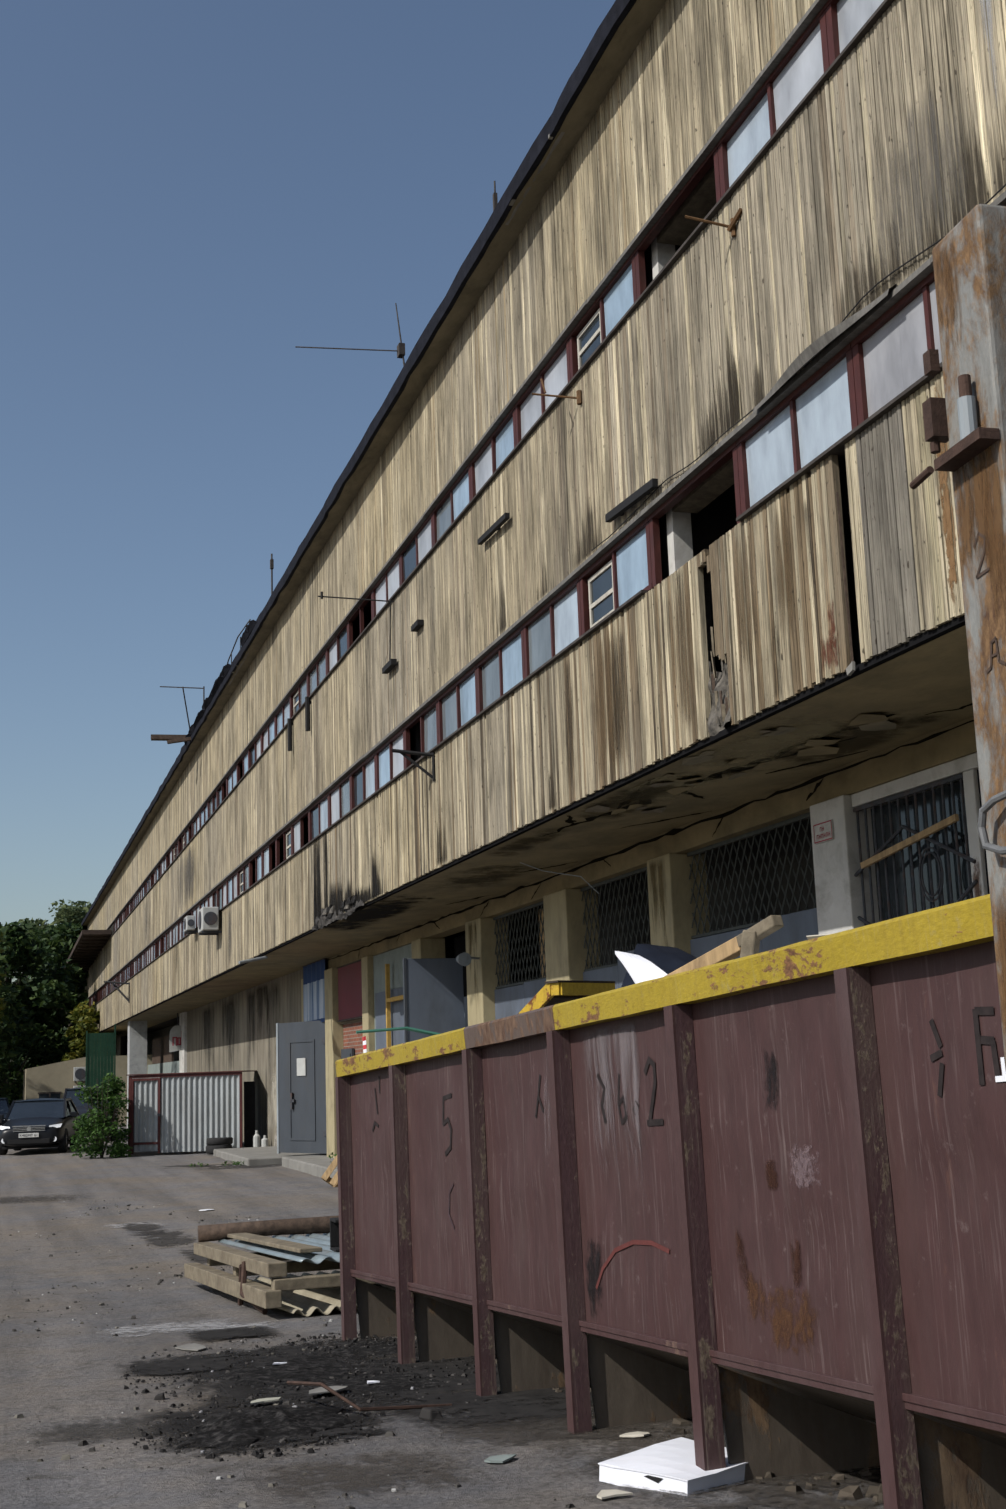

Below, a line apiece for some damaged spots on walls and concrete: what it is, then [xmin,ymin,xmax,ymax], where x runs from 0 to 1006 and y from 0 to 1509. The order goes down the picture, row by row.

water stain [700,347,763,455]
rust [937,443,1005,613]
spalling [710,588,725,672]
water stain [313,833,383,926]
crack [325,703,974,962]